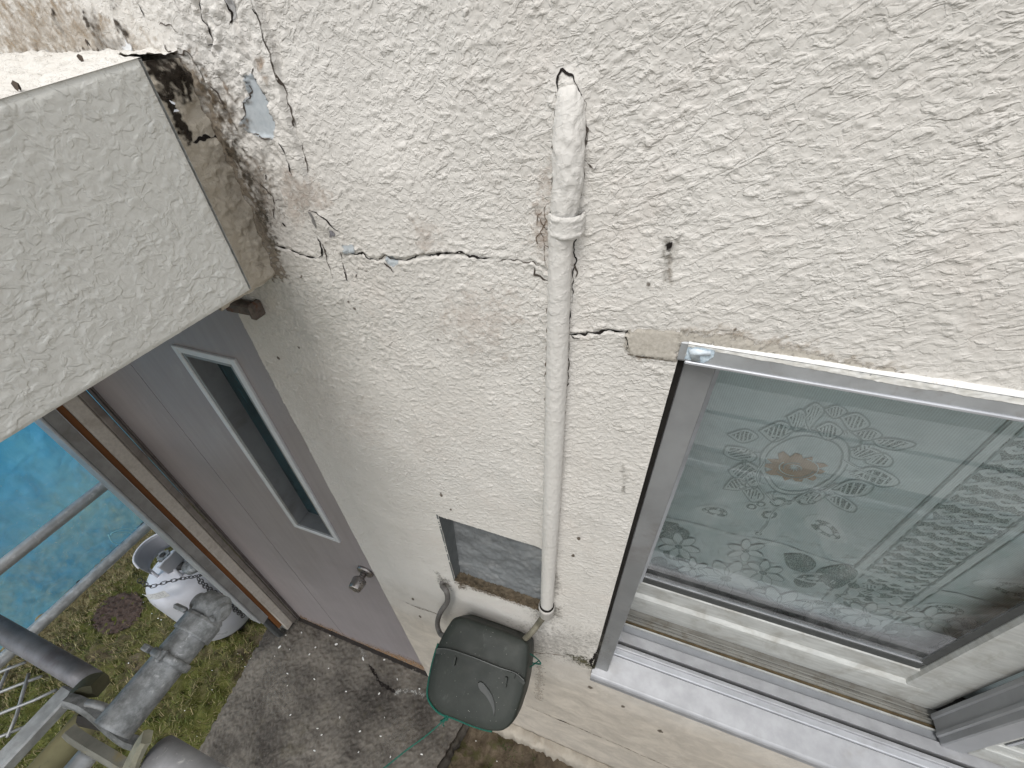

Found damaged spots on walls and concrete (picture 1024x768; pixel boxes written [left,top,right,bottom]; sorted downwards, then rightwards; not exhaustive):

leakage [134,49,287,281]
peeling [239,74,275,139]
crack [137,0,669,417]